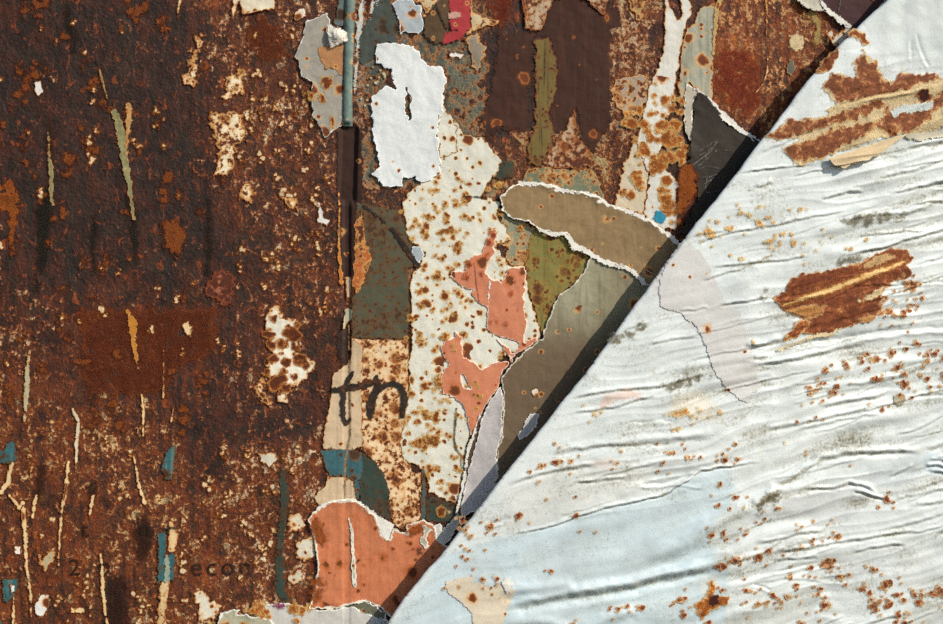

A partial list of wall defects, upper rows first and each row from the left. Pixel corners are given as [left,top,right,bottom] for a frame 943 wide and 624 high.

peeling [449,0,500,73]
peeling [522,0,554,32]
peeling [358,0,447,187]
peeling [609,0,719,231]
corrosion [766,29,943,166]
corrosion [261,314,310,394]
peeling [252,305,319,406]
peeling [272,172,331,257]
corrosion [404,177,484,352]
corrosion [698,204,943,412]
corrosion [670,580,730,624]
corrosion [715,547,943,624]